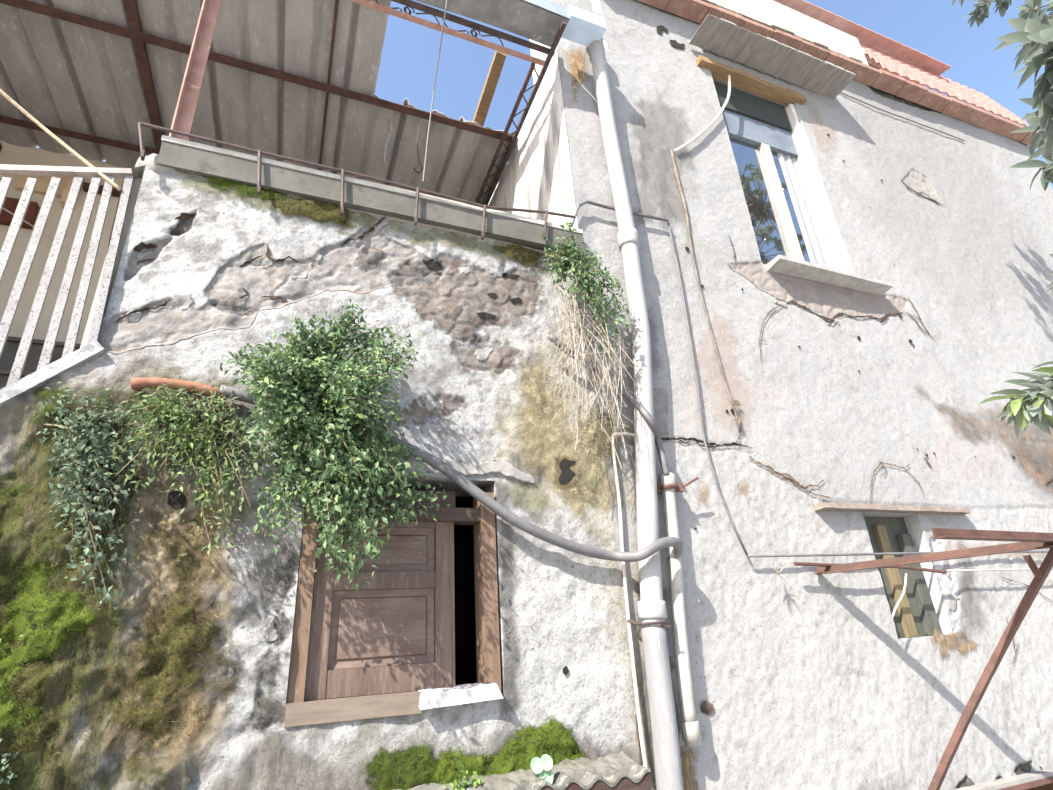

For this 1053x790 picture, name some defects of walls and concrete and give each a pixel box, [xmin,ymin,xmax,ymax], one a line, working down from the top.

flaking render [100,213,544,374]
flaking render [728,261,910,326]
crack [759,298,933,360]
crack [661,417,833,499]
water stain [121,512,232,763]
water stain [214,734,377,790]